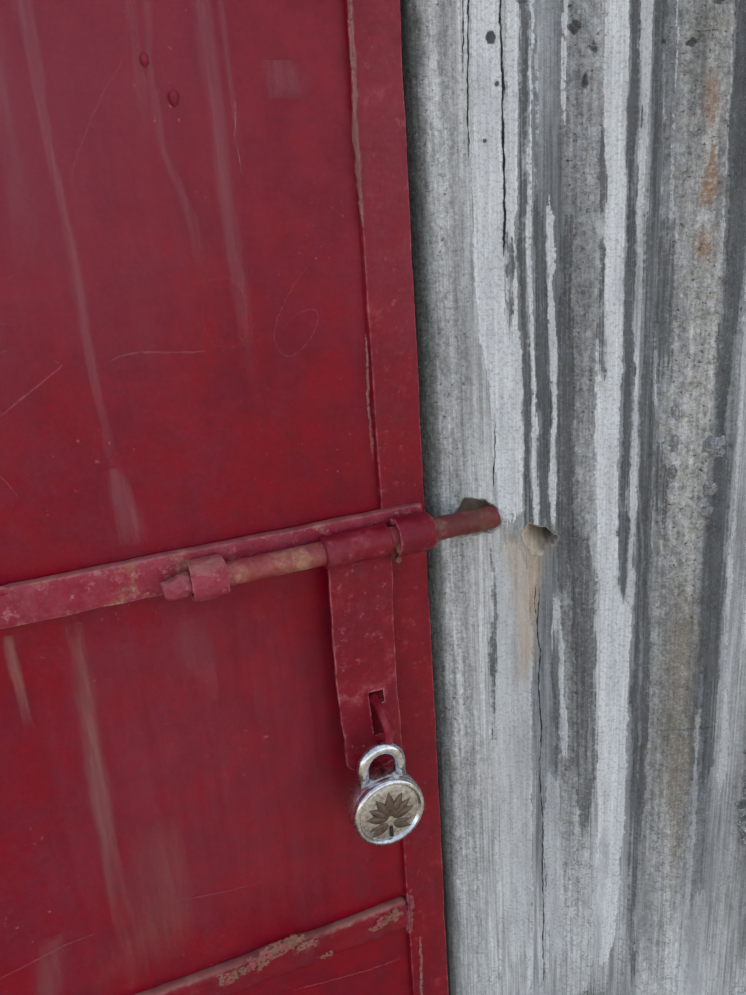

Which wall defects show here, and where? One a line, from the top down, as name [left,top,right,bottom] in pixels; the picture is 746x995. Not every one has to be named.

crack [462,0,470,156]
crack [498,0,506,256]
damp [597,128,608,212]
damp [488,585,498,713]
spalling [520,522,560,556]
damp [503,0,598,837]
damp [596,238,607,386]
damp [616,0,680,975]
damp [700,0,746,791]
crack [534,588,547,980]